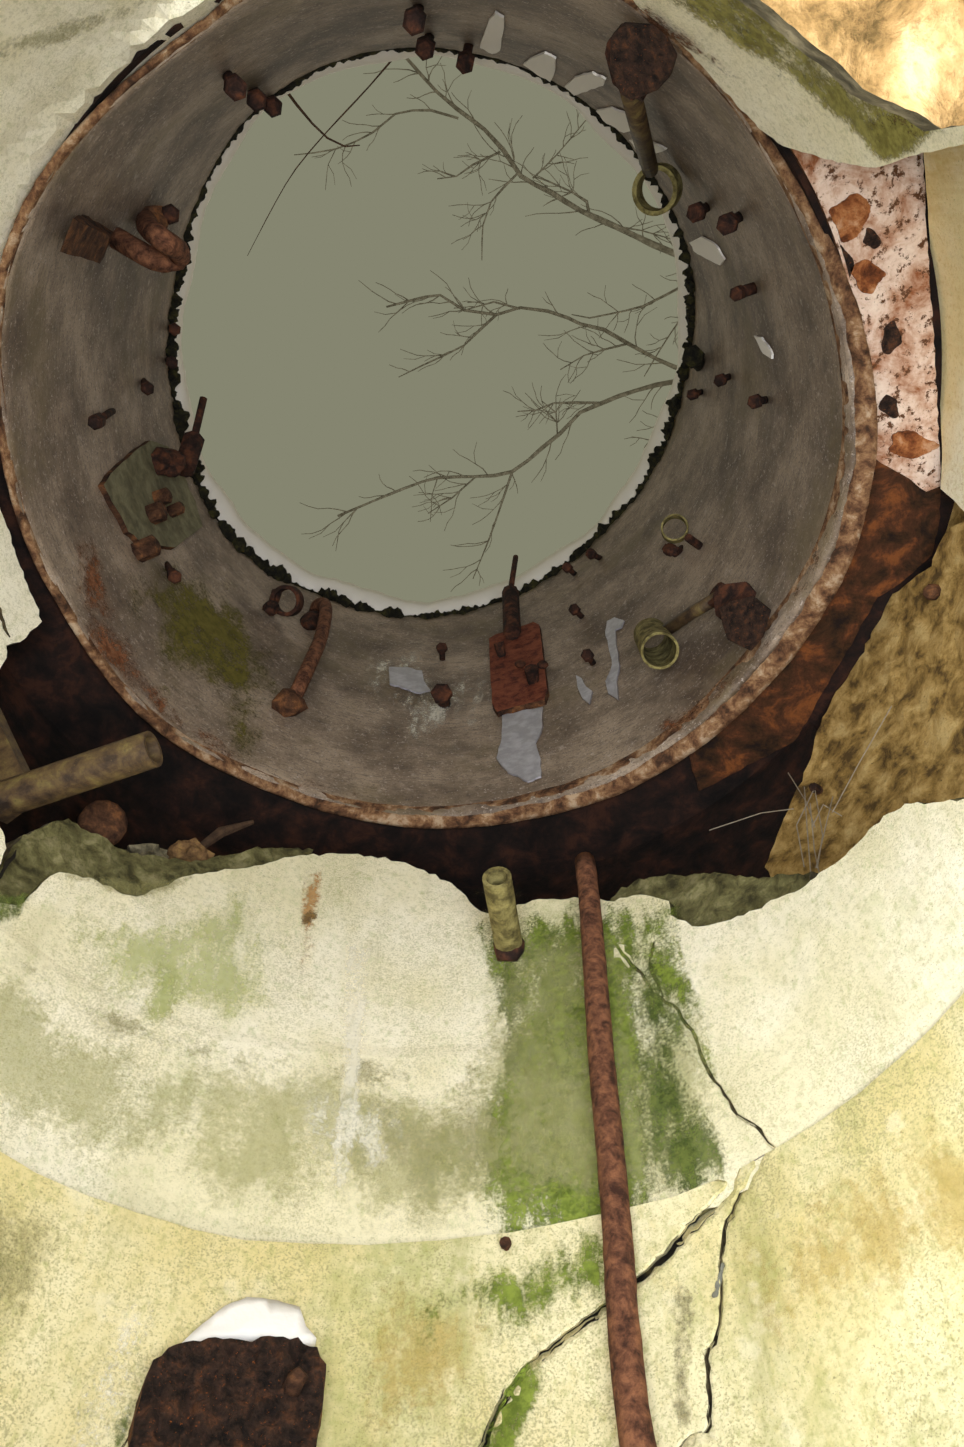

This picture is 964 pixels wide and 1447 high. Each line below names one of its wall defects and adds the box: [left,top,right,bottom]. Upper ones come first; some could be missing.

rust [0,0,941,829]
crack [0,607,10,638]
crack [0,850,17,879]
spalling [0,818,313,905]
spalling [610,871,818,927]
leakage [498,966,526,1075]
leakage [632,956,724,1196]
crack [611,939,774,1147]
crack [479,1303,606,1447]
crack [637,1191,741,1447]